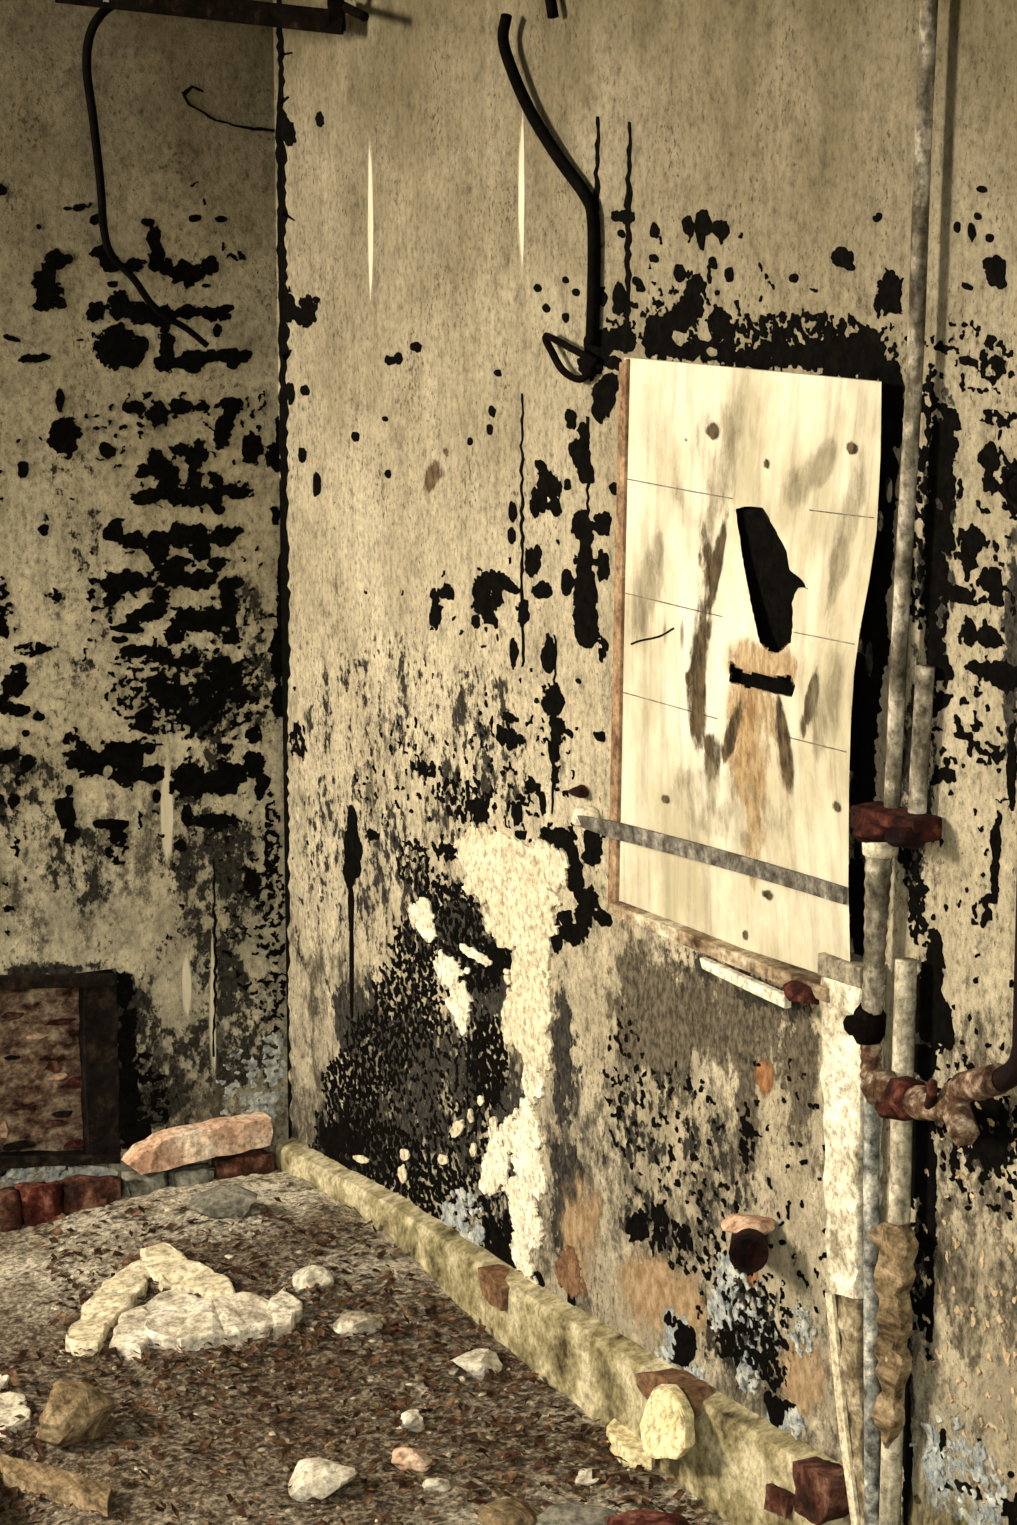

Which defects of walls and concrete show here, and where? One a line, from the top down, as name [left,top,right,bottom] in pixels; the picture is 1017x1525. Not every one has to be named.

peeling [315,111,325,127]
peeling [0,461,29,479]
peeling [3,334,51,363]
peeling [30,218,253,374]
peeling [279,286,320,328]
peeling [298,447,321,497]
peeling [0,576,53,820]
peeling [16,382,310,1150]
peeling [308,209,1017,1306]
leakage [291,633,531,1250]
peeling [602,1006,860,1525]
peeling [902,1095,1017,1525]